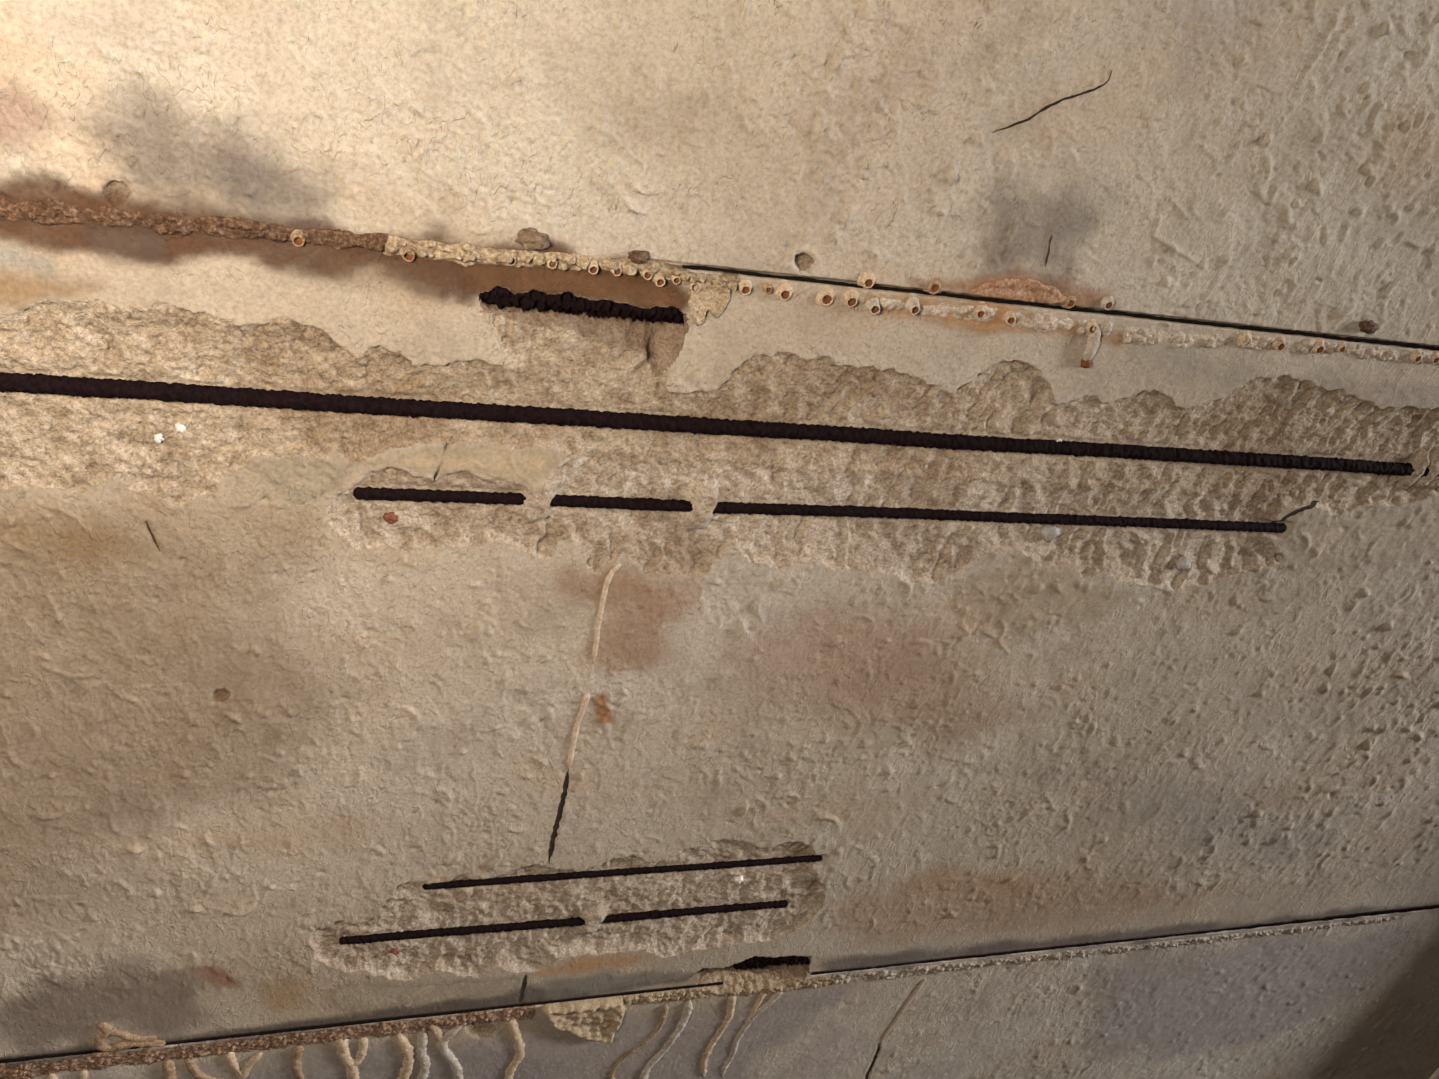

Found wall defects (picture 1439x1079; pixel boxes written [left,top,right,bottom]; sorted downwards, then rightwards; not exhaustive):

rust [0,180,690,310]
rust [879,276,1102,332]
spalling [0,286,1439,591]
crack [548,563,621,864]
spalling [310,839,827,987]
damp [0,905,1435,1079]
crack [865,978,926,1079]